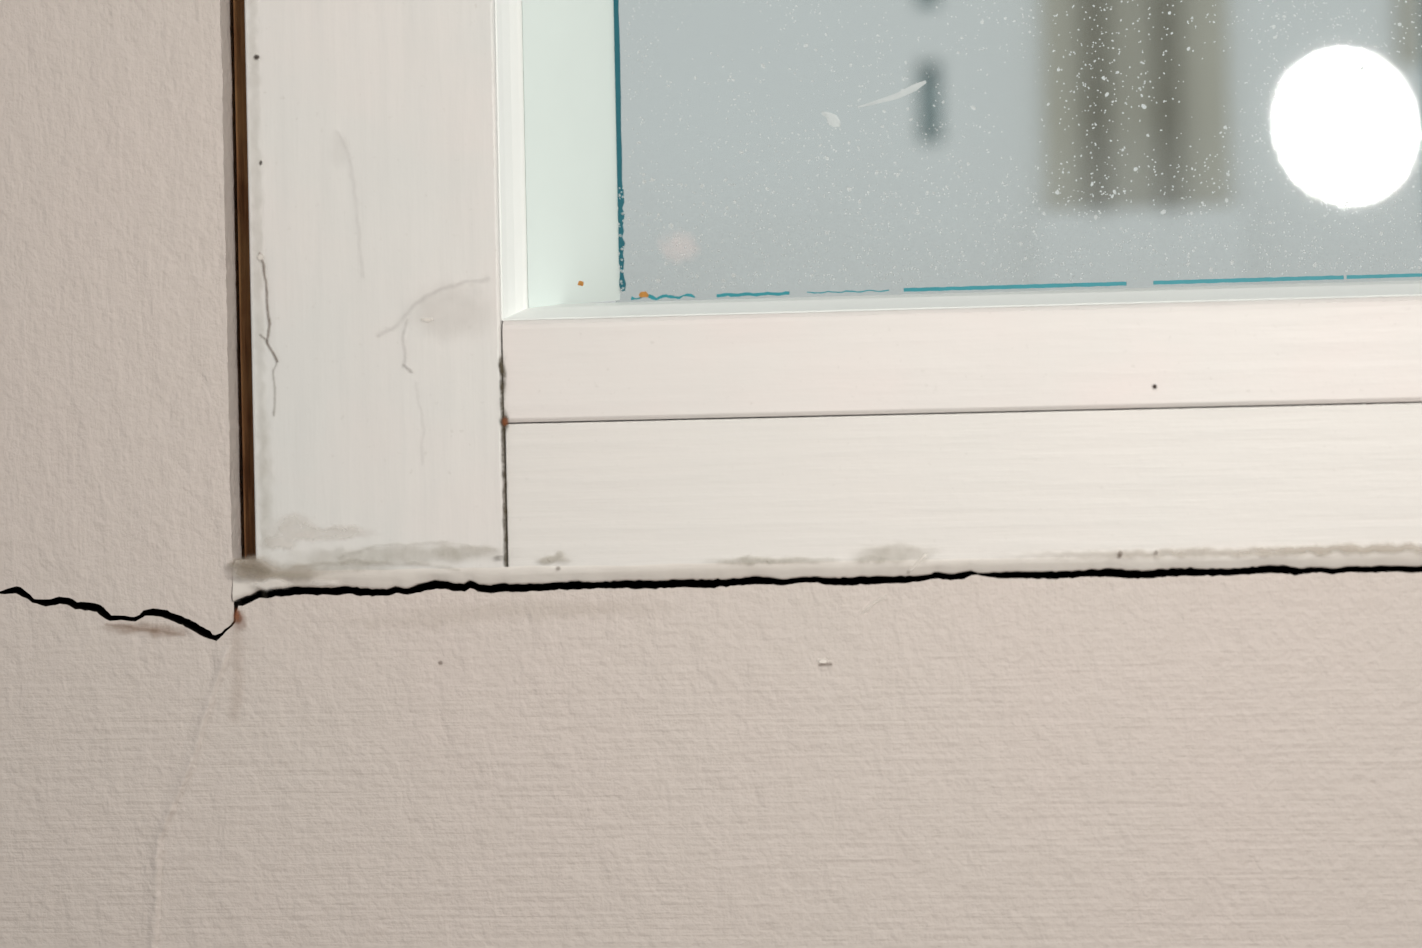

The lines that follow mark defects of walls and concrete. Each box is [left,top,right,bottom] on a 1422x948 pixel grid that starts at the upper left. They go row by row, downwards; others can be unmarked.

crack [0,565,1422,641]